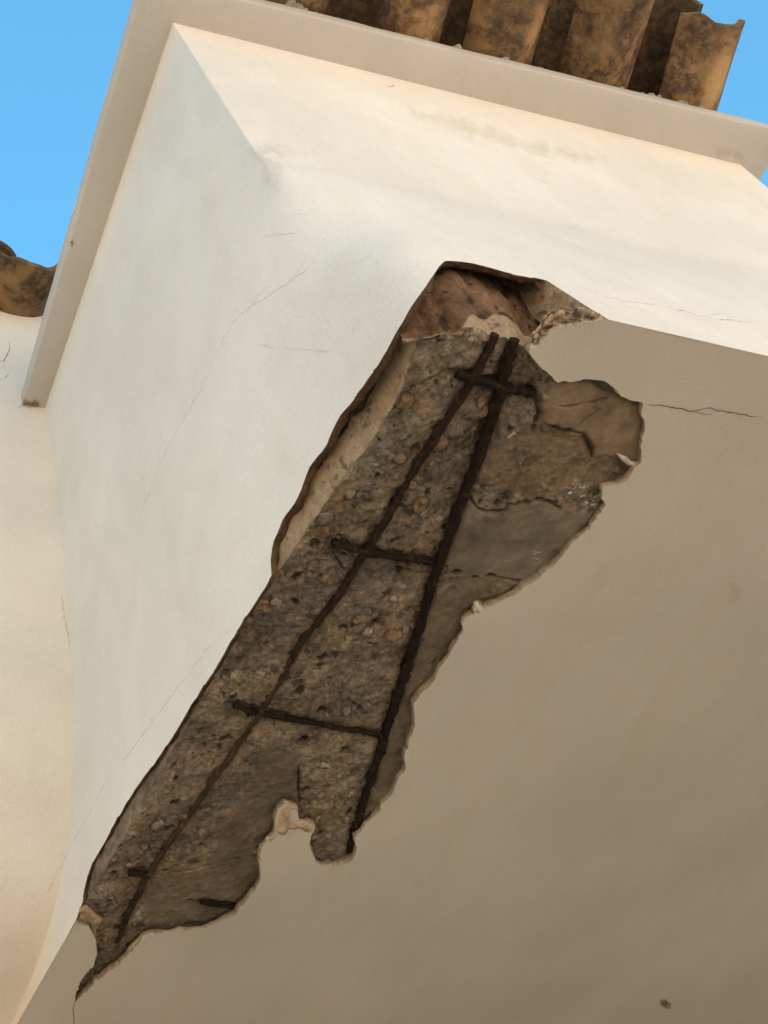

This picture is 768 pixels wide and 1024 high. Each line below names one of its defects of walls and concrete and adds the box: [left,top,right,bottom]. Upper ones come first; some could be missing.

spalling [67,261,645,1002]
crack [649,404,755,417]